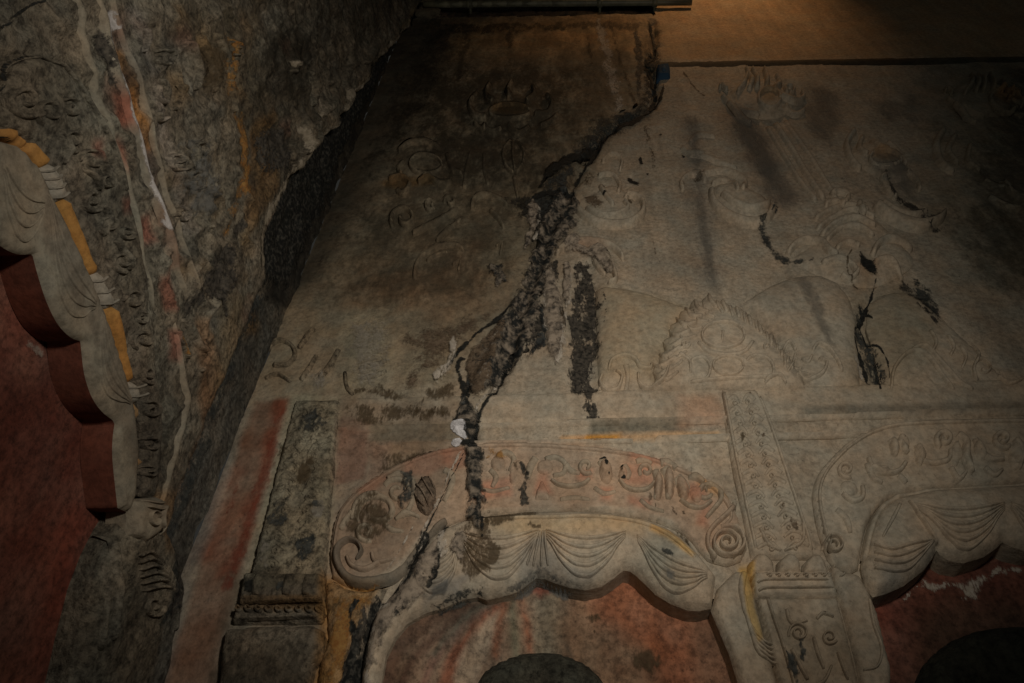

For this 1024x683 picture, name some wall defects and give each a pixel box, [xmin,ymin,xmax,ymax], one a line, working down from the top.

crack [410,296,531,567]
damp [347,18,662,482]
spalling [403,173,614,529]
crack [533,22,705,219]
damp [758,204,814,264]
damp [899,279,939,324]